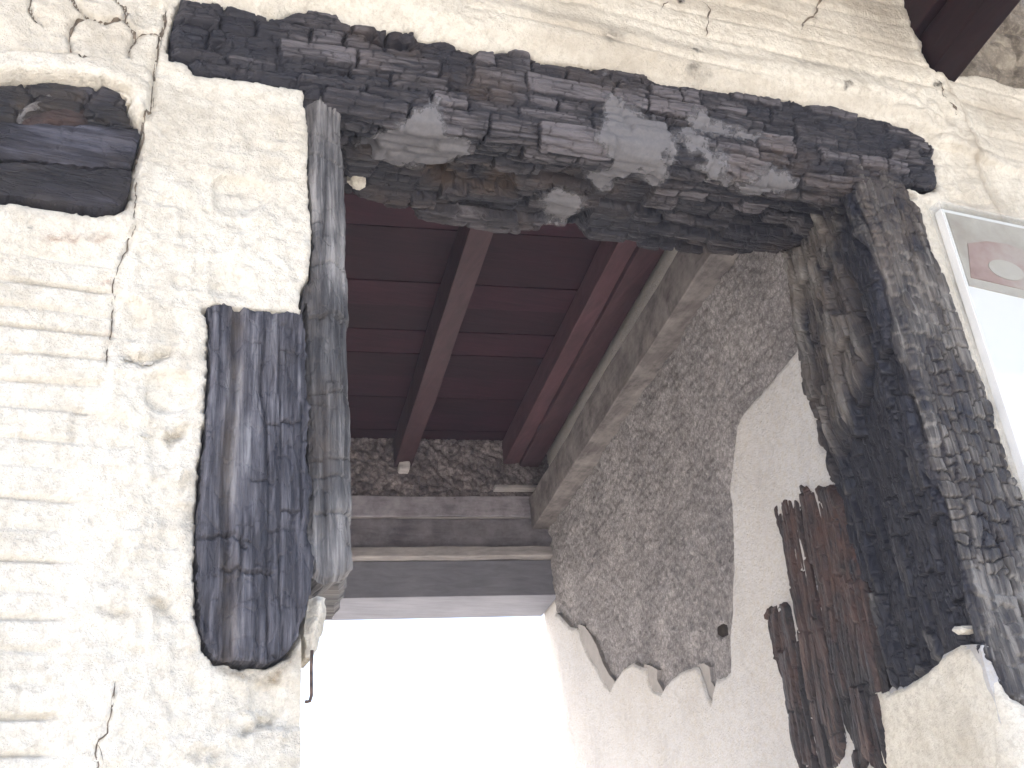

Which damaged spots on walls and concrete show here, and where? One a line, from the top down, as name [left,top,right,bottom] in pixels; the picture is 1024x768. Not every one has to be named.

crack [802,0,822,29]
crack [69,0,167,363]
crack [94,684,115,768]